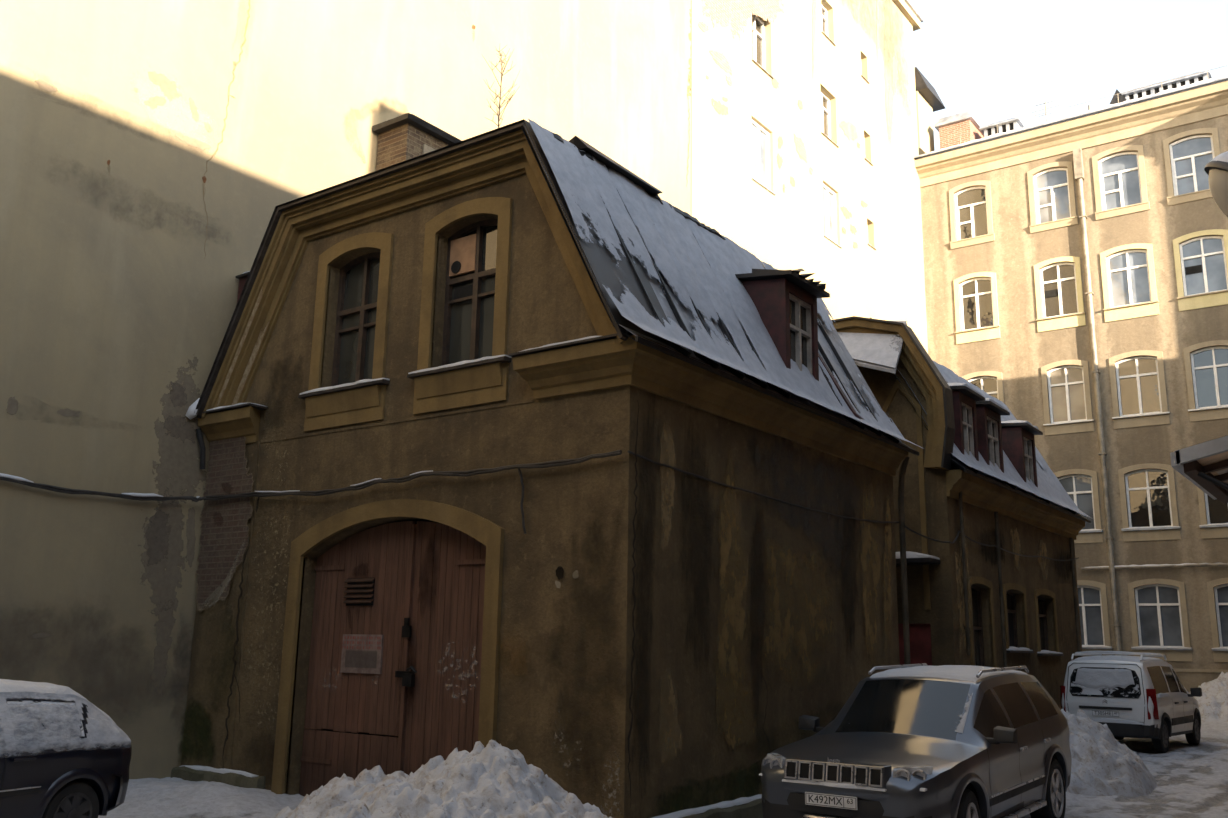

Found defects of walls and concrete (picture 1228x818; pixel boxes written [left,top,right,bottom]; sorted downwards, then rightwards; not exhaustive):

peeling [134,71,212,132]
crack [203,0,250,259]
flaking render [709,50,732,116]
flaking render [697,0,785,39]
flaking render [777,134,813,193]
damp [850,0,902,136]
flaking render [138,357,254,696]
crack [223,548,249,765]
damp [634,420,892,773]
damp [659,763,762,815]